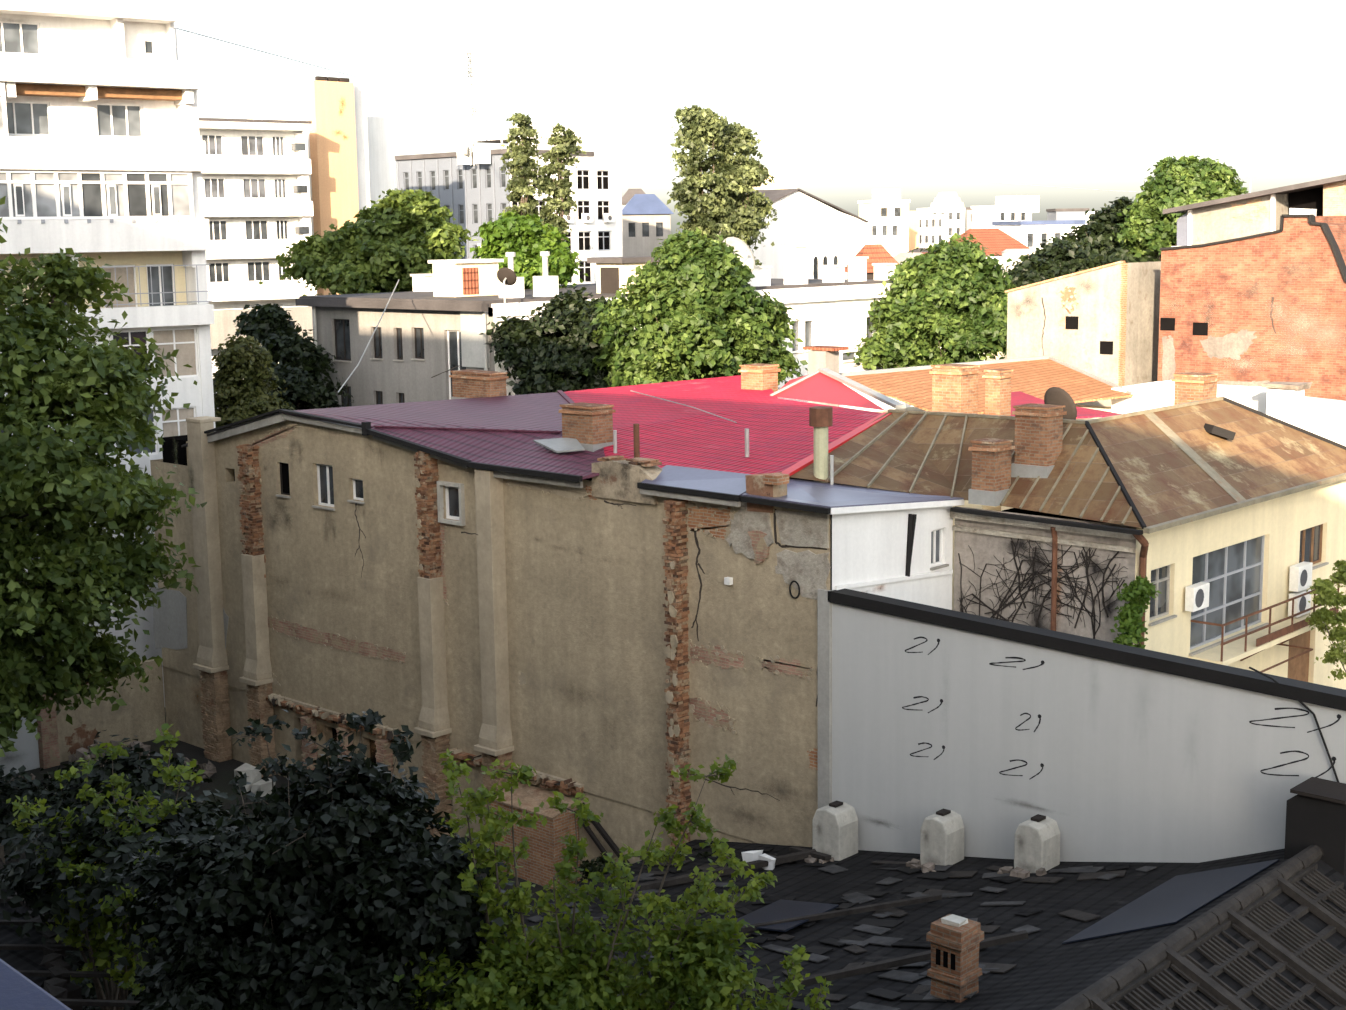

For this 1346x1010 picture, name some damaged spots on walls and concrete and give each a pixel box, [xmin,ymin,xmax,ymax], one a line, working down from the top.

spalling [1056,285,1079,336]
flaking render [1200,329,1257,383]
crack [355,503,366,577]
spalling [414,450,449,606]
spalling [268,616,406,665]
spalling [662,498,814,849]